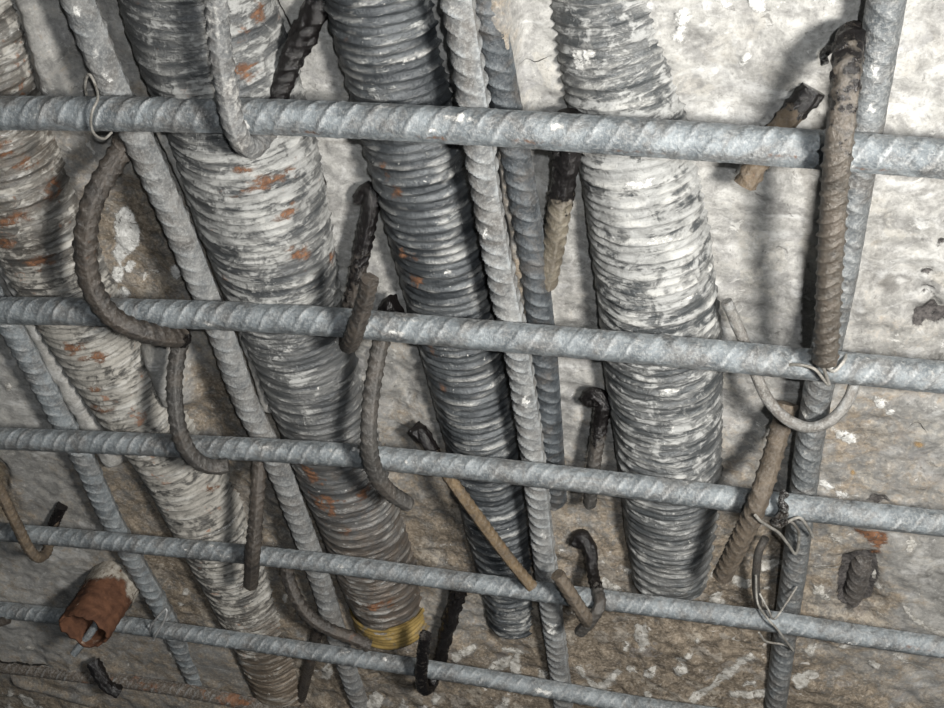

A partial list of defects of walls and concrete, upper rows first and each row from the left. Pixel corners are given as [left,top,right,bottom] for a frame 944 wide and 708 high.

spalling [0,0,365,469]
spalling [0,285,417,708]
spalling [240,0,944,708]